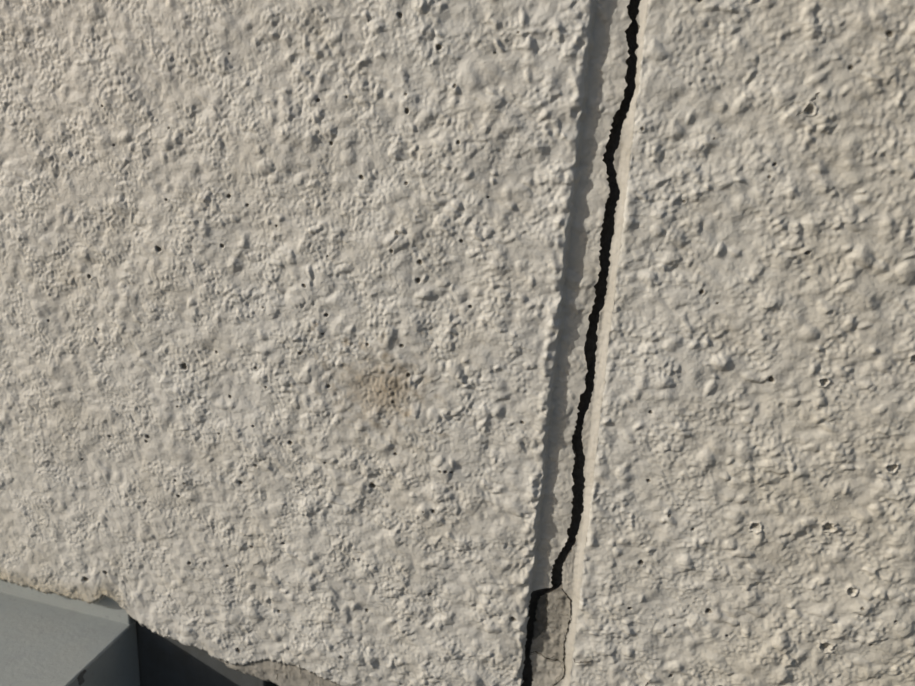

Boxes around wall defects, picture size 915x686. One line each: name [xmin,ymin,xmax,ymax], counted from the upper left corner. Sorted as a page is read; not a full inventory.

spalling [530,589,572,686]
crack [521,0,641,686]